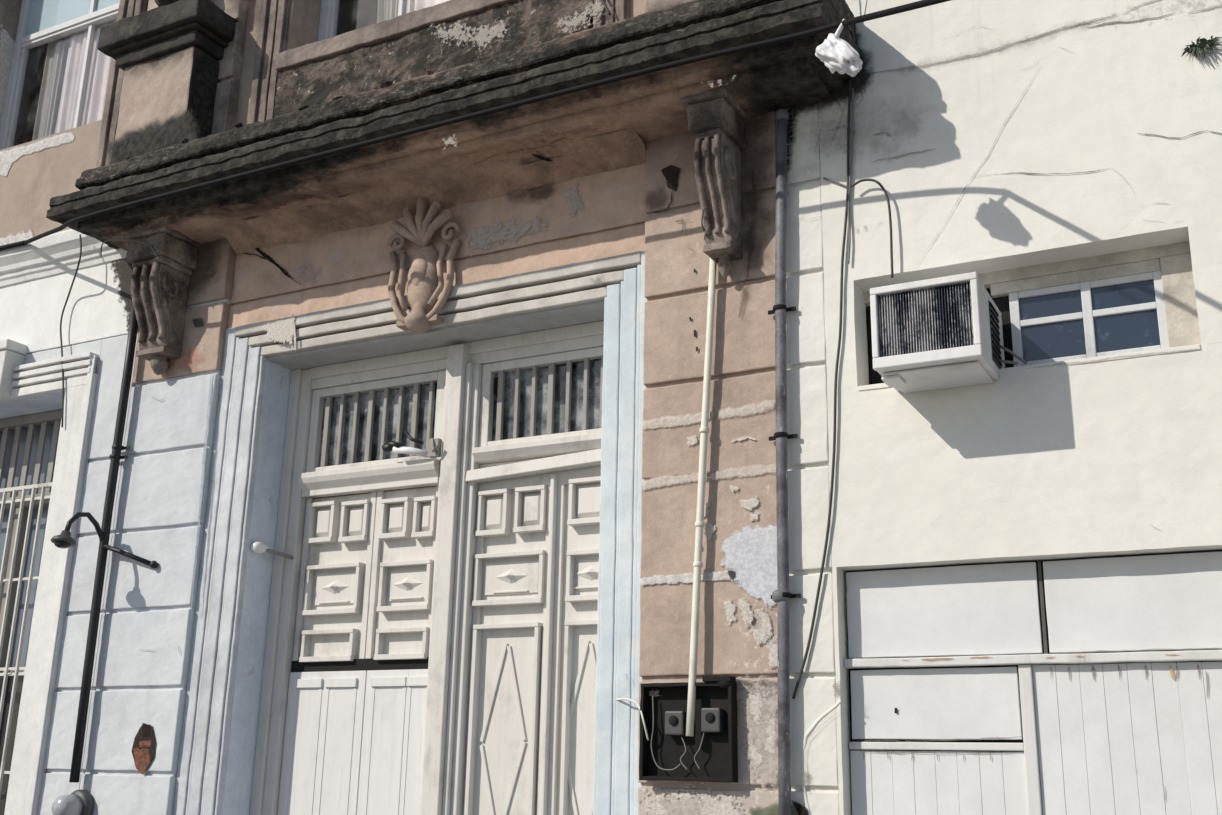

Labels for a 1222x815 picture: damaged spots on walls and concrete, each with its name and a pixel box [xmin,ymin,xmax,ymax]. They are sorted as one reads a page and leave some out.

leakage [786,107,798,171]
crack [871,0,1222,264]
crack [243,248,302,285]
peeling [718,400,775,419]
peeling [637,464,808,815]